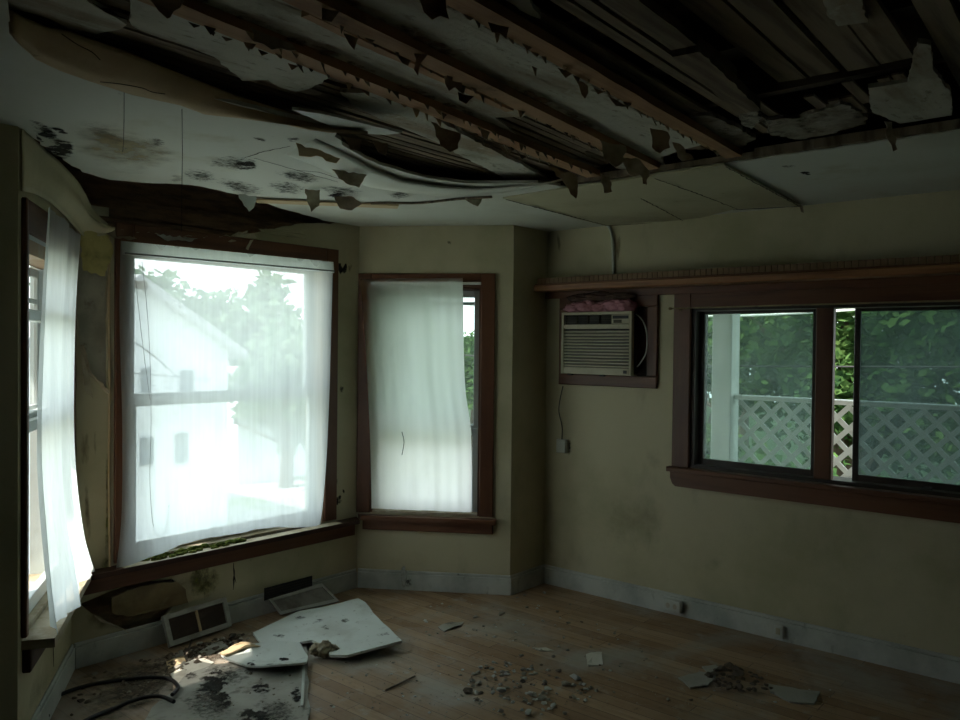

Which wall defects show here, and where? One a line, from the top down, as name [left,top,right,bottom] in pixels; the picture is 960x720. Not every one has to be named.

flaking render [150,0,184,19]
flaking render [419,0,449,20]
flaking render [244,27,330,78]
flaking render [444,75,502,107]
flaking render [558,65,719,161]
mould [36,122,73,159]
flaking render [386,89,650,198]
mould [186,171,257,193]
mould [216,156,255,169]
mould [272,172,353,198]
flaking render [296,143,367,212]
spalling [76,246,111,567]